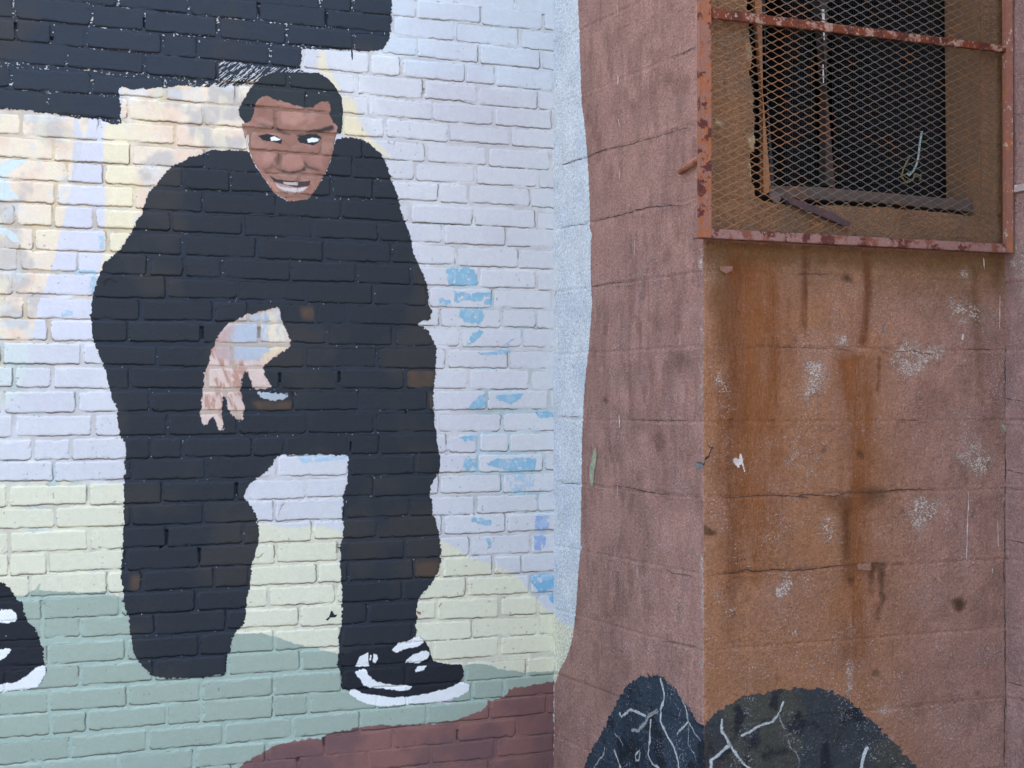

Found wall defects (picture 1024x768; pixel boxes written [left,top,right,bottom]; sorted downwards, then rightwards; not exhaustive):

crack [562,125,694,165]
crack [708,489,930,503]
crack [666,563,876,576]